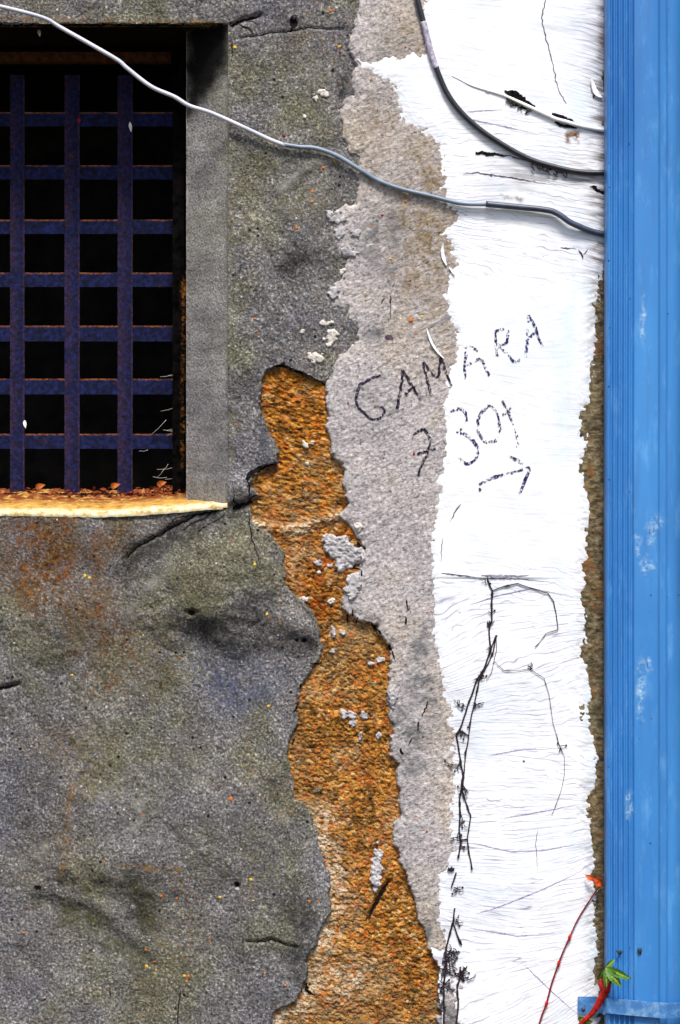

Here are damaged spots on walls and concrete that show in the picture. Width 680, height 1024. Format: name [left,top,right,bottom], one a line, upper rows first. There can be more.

crack [127,464,274,566]
spalling [244,364,442,1024]
crack [249,939,297,948]